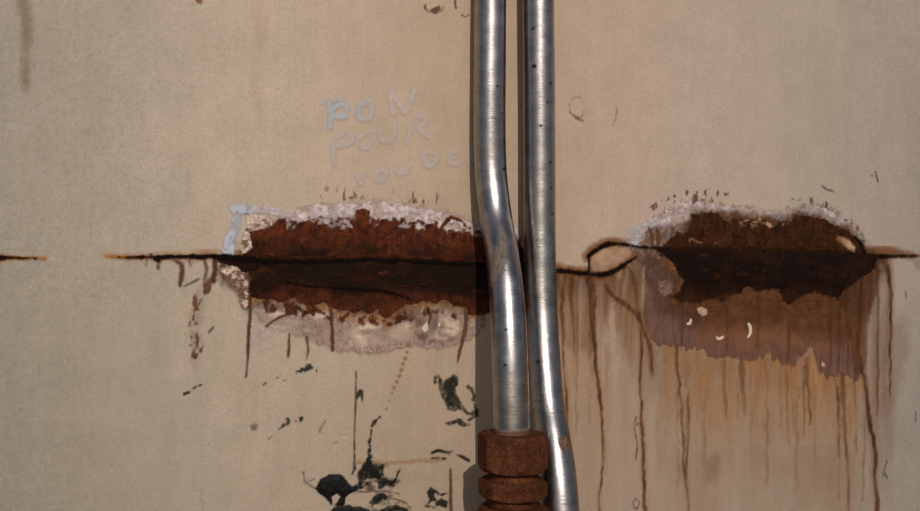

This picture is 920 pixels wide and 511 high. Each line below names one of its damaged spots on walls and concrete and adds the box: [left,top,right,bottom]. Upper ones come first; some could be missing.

crack [0,254,46,262]
crack [106,253,487,358]
rust [221,194,490,393]
rust [514,226,525,295]
rust [556,190,893,511]
crack [556,237,919,279]